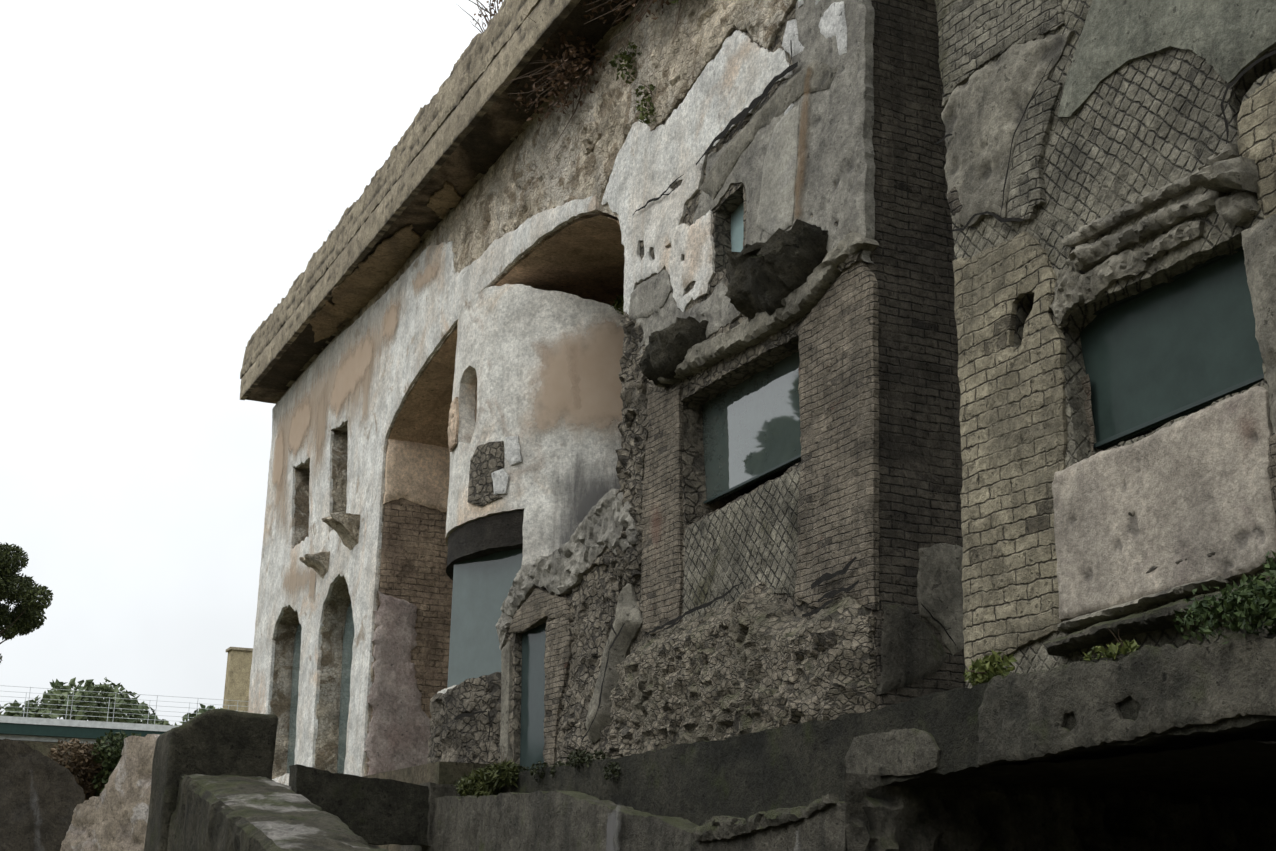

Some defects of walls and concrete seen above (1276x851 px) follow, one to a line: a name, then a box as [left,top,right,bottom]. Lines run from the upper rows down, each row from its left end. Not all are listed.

peeling [700,0,848,235]
flaking render [947,186,964,216]
damp [276,320,385,522]